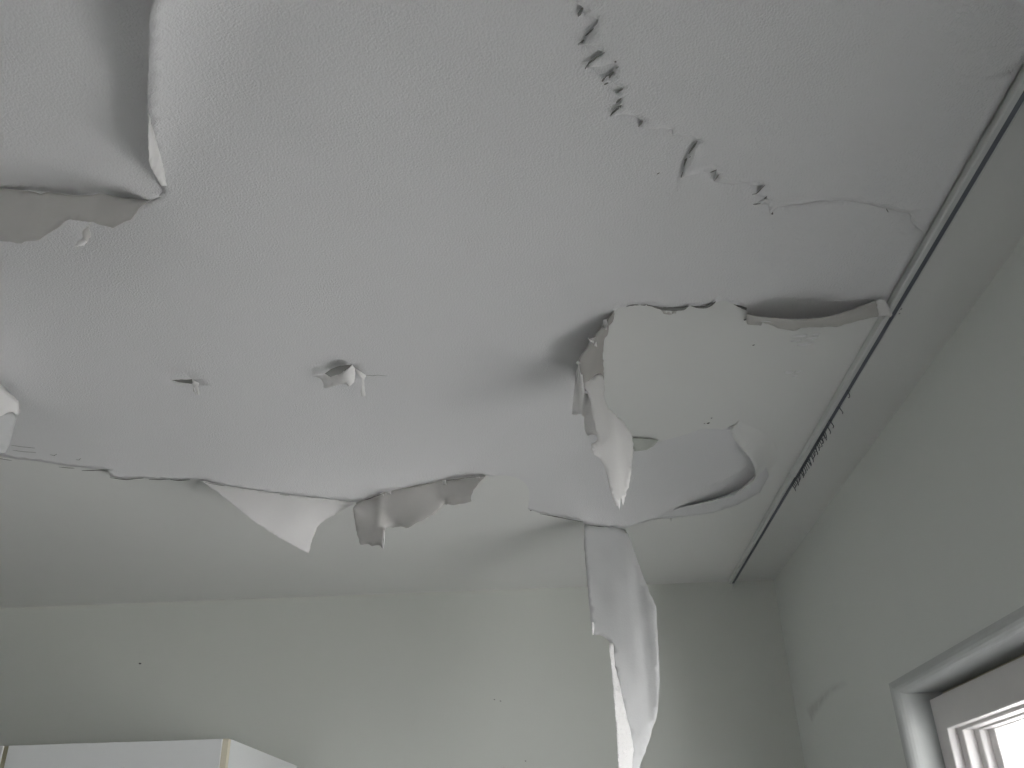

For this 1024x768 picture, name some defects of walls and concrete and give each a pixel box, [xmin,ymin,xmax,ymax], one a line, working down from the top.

crack [578,7,643,127]
peeling [0,0,924,553]
crack [62,467,224,486]
peeling [584,525,660,768]